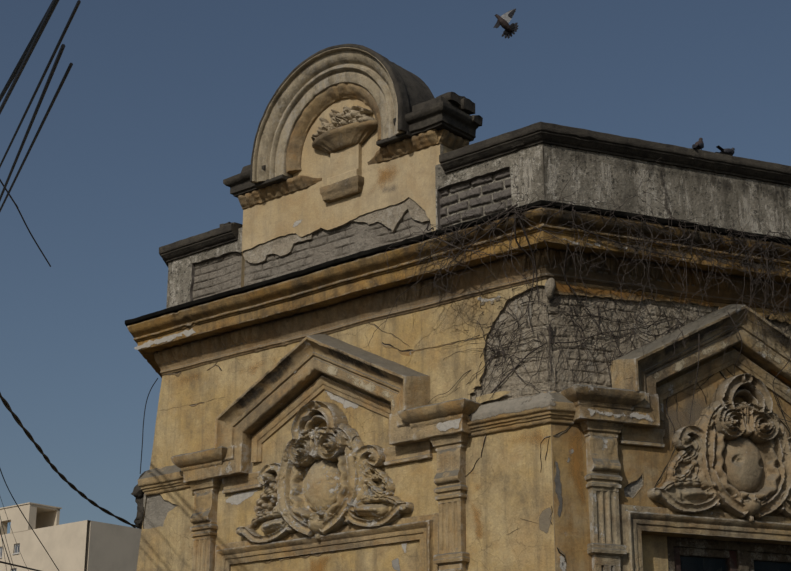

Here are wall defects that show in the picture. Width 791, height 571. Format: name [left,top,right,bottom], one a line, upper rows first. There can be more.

flaking render [193,168,512,301]
peeling [134,329,196,350]
crack [369,317,482,356]
flaking render [436,278,718,431]
crack [465,434,487,477]
flaking render [143,494,178,529]
peeling [539,449,574,533]